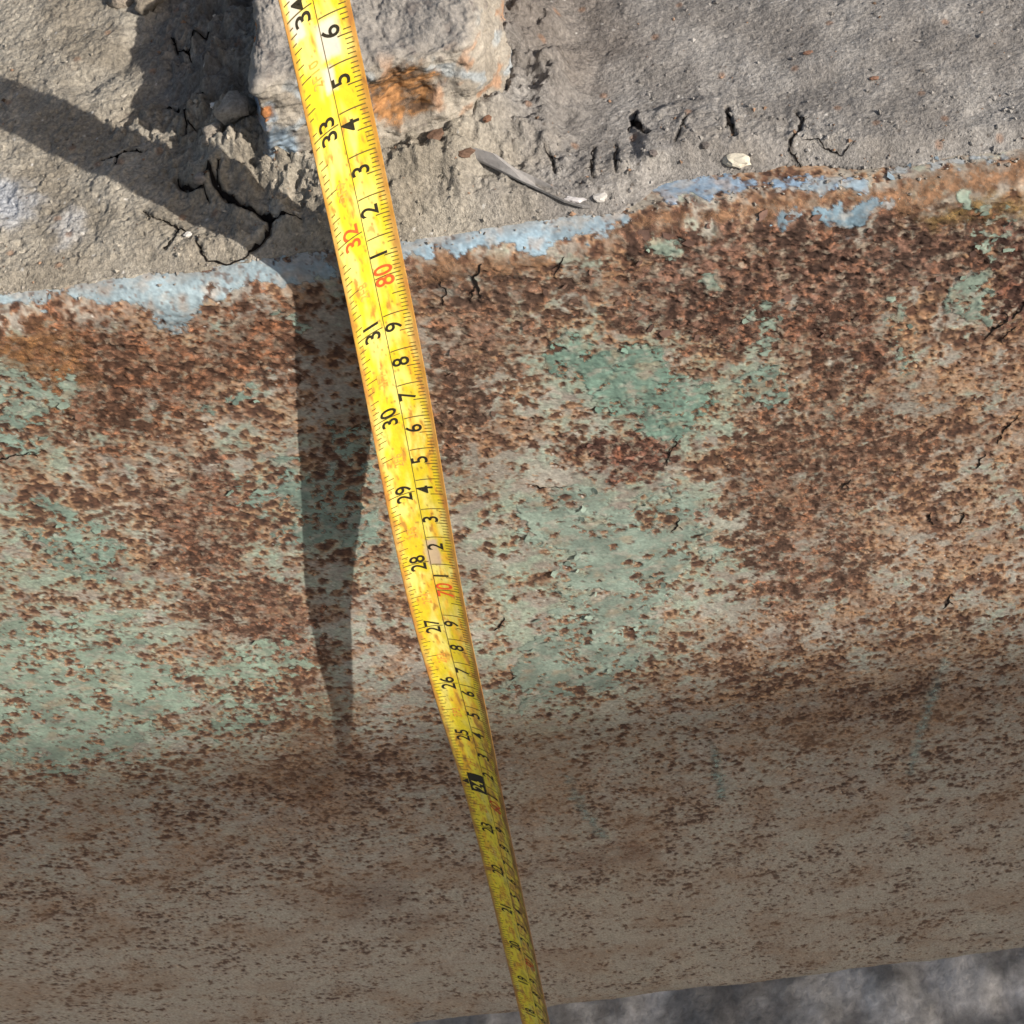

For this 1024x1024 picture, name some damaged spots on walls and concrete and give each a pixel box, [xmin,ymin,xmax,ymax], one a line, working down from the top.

crack [101,149,142,164]
rust [368,65,439,125]
crack [788,113,851,168]
peeling [0,251,336,335]
crack [143,159,301,266]
crack [437,264,482,305]
peeling [400,212,630,260]
rust [0,280,313,473]
rust [404,158,1024,623]
rust [138,449,333,691]
peeling [493,483,735,717]
peeling [0,610,326,779]